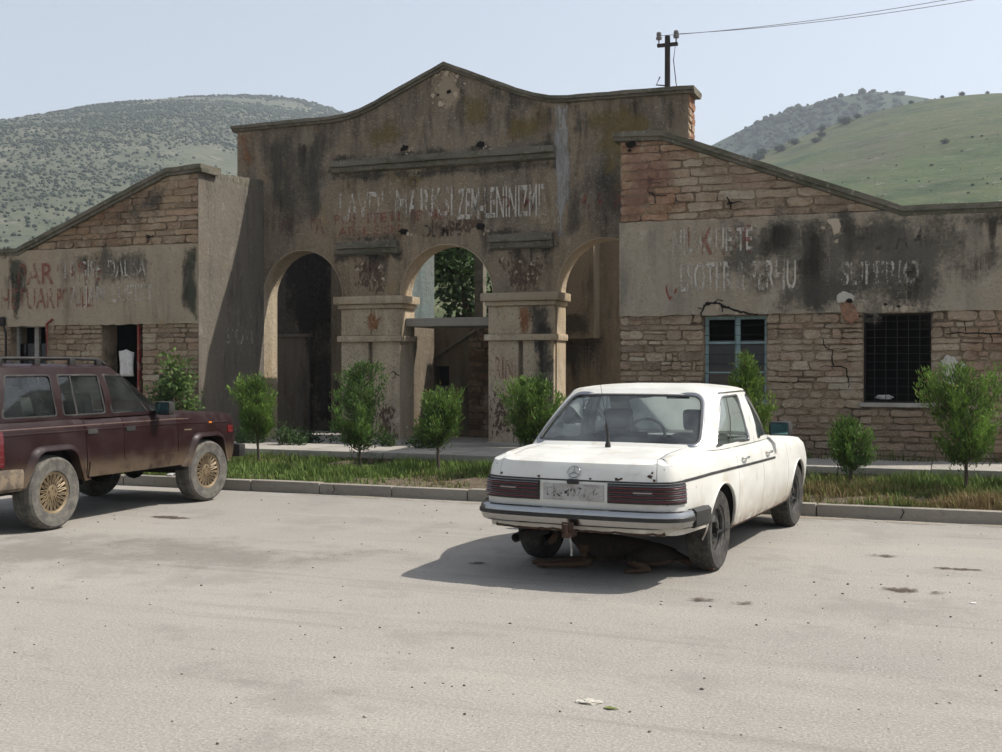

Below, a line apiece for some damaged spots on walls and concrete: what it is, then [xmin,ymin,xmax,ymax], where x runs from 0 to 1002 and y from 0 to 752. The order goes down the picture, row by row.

spalling [430,70,466,110]
damp [9,260,26,314]
damp [183,248,197,318]
crack [698,299,758,316]
spalling [836,291,859,324]
damp [726,206,1002,323]
flaking render [468,328,518,443]